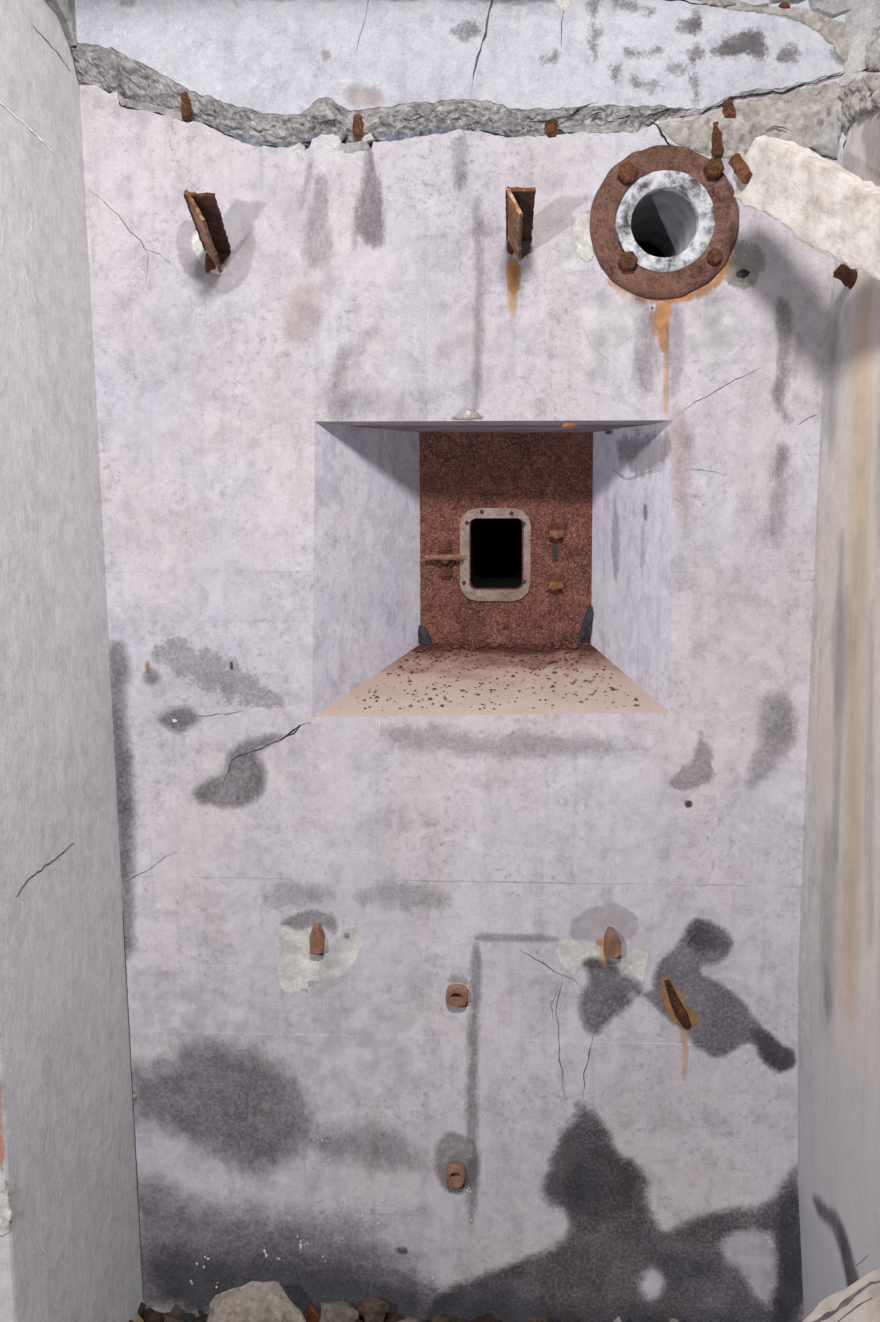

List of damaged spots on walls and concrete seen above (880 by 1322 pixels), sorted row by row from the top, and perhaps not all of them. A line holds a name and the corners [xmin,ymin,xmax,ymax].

spalling [181,91,192,121]
spalling [352,114,364,140]
crack [34,0,880,154]
water stain [360,154,382,245]
corrosion [506,259,520,312]
crack [223,722,310,784]
crack [521,951,593,1099]
corrosion [660,978,698,1050]
water stain [583,920,793,1069]
water stain [138,1052,300,1162]
spalling [0,1178,12,1236]
water stain [140,1109,858,1322]